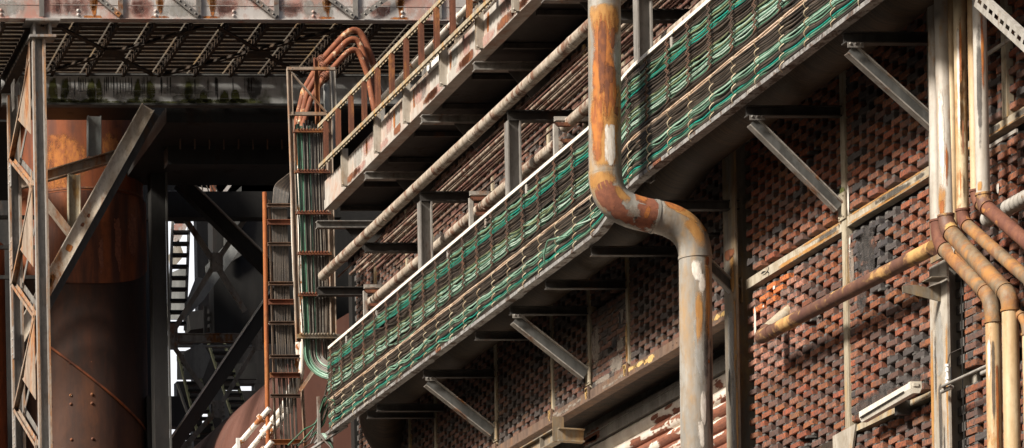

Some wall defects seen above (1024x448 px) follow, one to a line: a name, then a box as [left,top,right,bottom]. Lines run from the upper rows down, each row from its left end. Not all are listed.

rust [319,0,334,19]
rust [391,0,407,20]
rust [449,34,473,70]
rust [380,108,401,149]
rust [590,4,707,243]
rust [32,38,86,448]
peeling [691,261,706,293]
peeling [694,319,704,379]